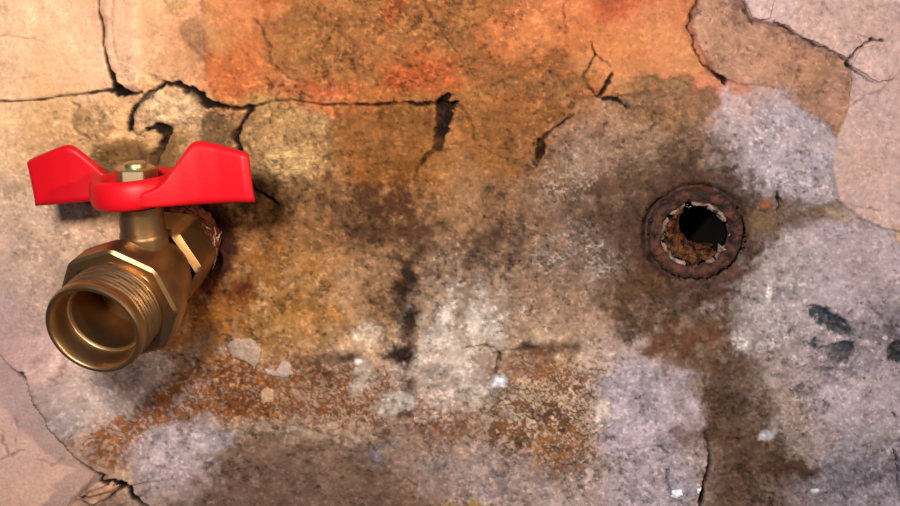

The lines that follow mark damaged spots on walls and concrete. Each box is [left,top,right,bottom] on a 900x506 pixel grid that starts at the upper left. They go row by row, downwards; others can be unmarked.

crack [0,4,474,180]
spalling [135,74,339,183]
crack [532,114,574,167]
crack [583,49,627,107]
peeling [744,0,900,82]
rust [164,203,255,348]
rust [663,208,717,265]
damp [550,141,837,506]
spalling [809,305,854,363]
spalling [887,340,900,362]
rust [73,352,610,488]
crack [100,474,149,506]